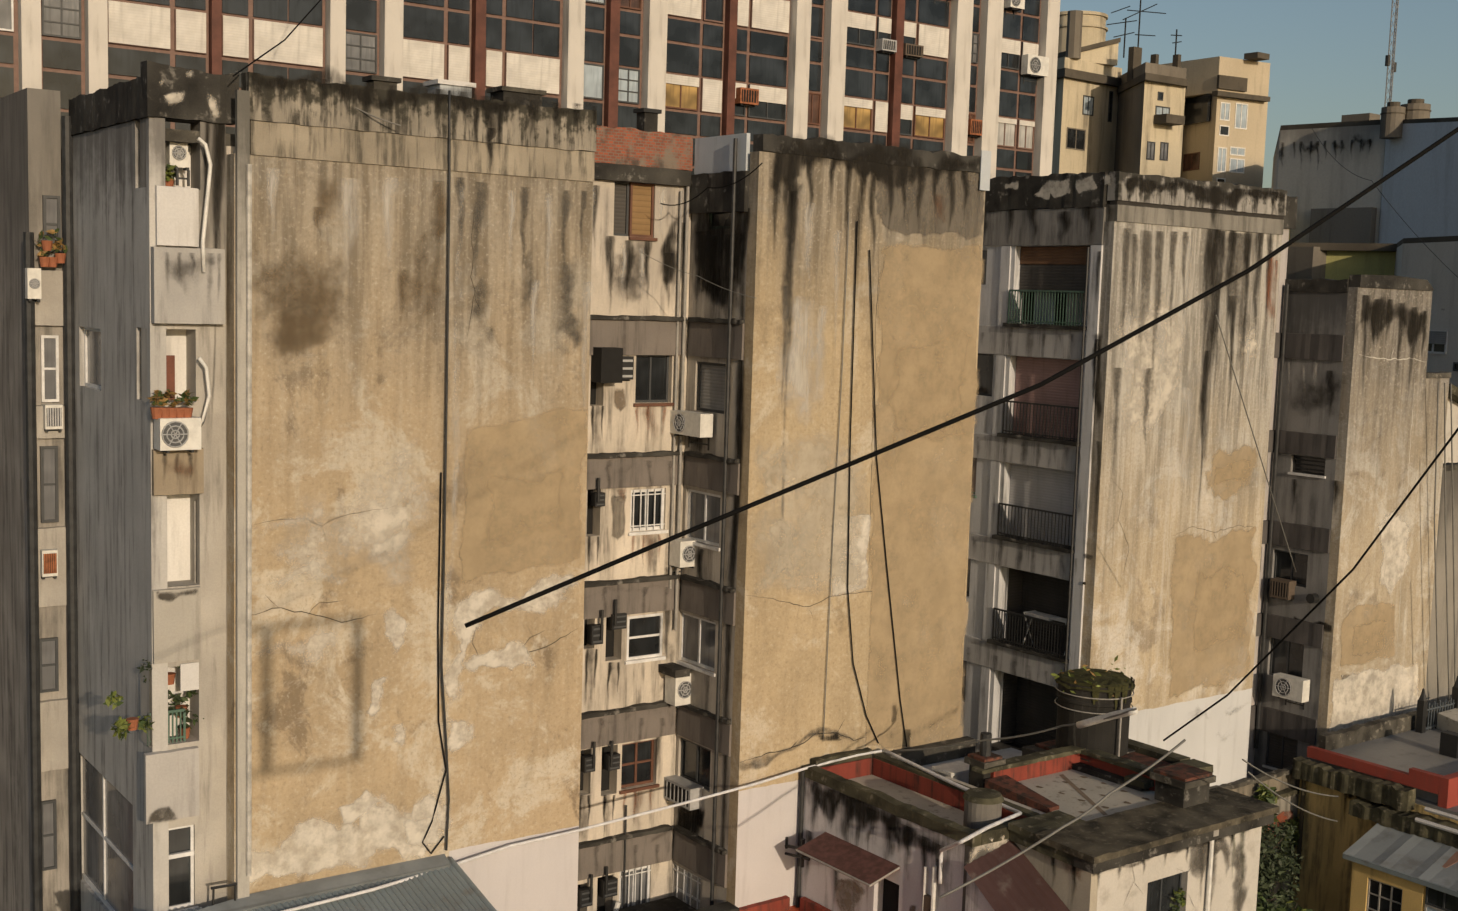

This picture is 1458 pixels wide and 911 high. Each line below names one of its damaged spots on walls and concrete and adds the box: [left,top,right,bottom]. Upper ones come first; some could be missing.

water stain [606,208,750,320]
water stain [1059,186,1277,459]
water stain [730,360,744,588]
crack [255,506,394,547]
crack [255,598,375,623]
flaking render [443,575,578,697]
crack [514,628,578,657]
flaking render [447,722,473,751]
crack [740,719,866,763]
flaking render [249,790,447,882]
water stain [806,782,940,876]
water stain [1051,832,1247,911]